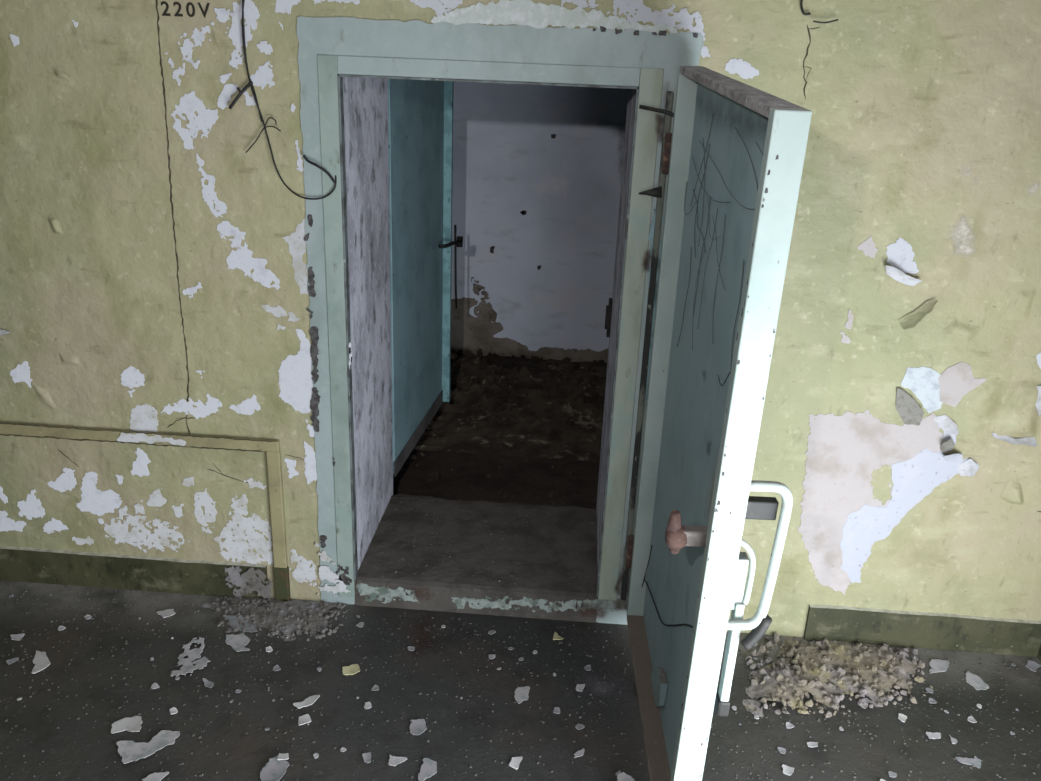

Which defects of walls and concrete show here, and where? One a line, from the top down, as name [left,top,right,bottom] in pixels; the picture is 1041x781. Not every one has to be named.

peeling [275,0,300,30]
peeling [410,0,712,58]
peeling [725,58,759,79]
crack [803,25,820,99]
peeling [165,0,280,290]
peeling [182,282,202,298]
peeling [283,219,308,294]
peeling [858,236,922,286]
peeling [10,361,32,388]
peeling [261,305,317,484]
peeling [0,366,273,599]
peeling [797,362,987,596]